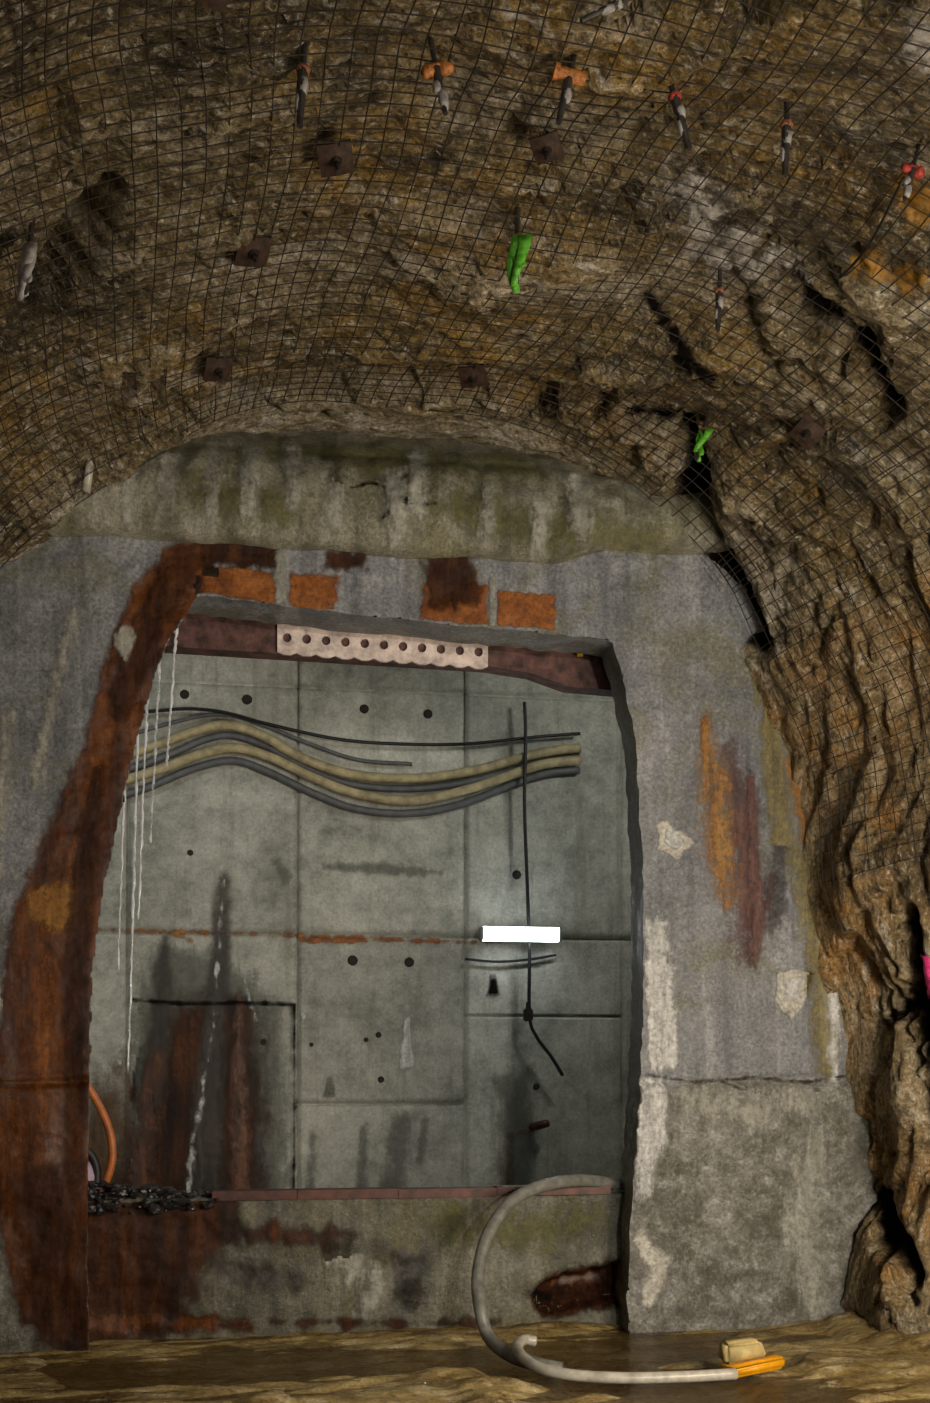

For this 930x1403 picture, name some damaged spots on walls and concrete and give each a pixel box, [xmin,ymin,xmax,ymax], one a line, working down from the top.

damp [241,446,262,517]
damp [283,442,304,508]
damp [386,446,427,547]
damp [478,484,494,544]
damp [531,501,549,555]
damp [568,474,594,532]
corrosion [420,556,557,630]
corrosion [699,686,832,1079]
corrosion [0,543,367,1351]
corrosion [279,933,515,944]
corrosion [382,1318,409,1329]
corrosion [438,1315,501,1328]